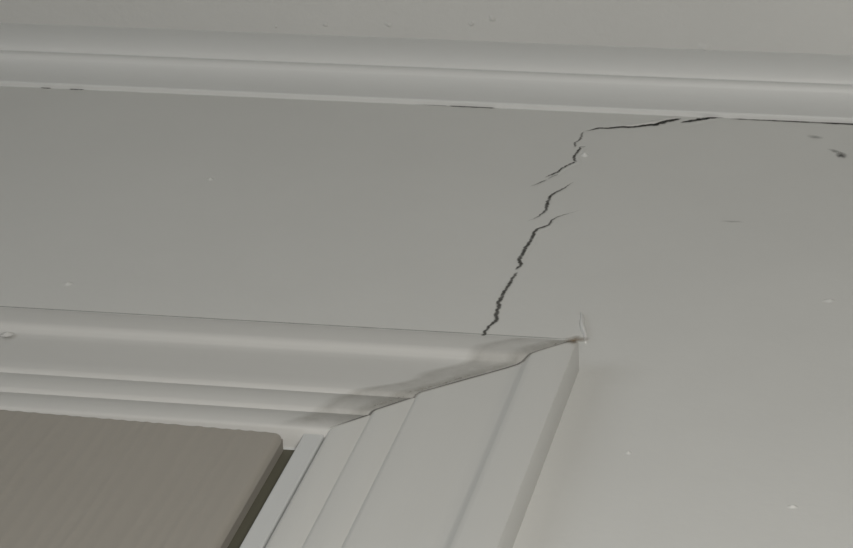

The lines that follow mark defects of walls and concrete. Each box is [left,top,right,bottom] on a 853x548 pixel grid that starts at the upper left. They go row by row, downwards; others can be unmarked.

crack [482,116,853,336]